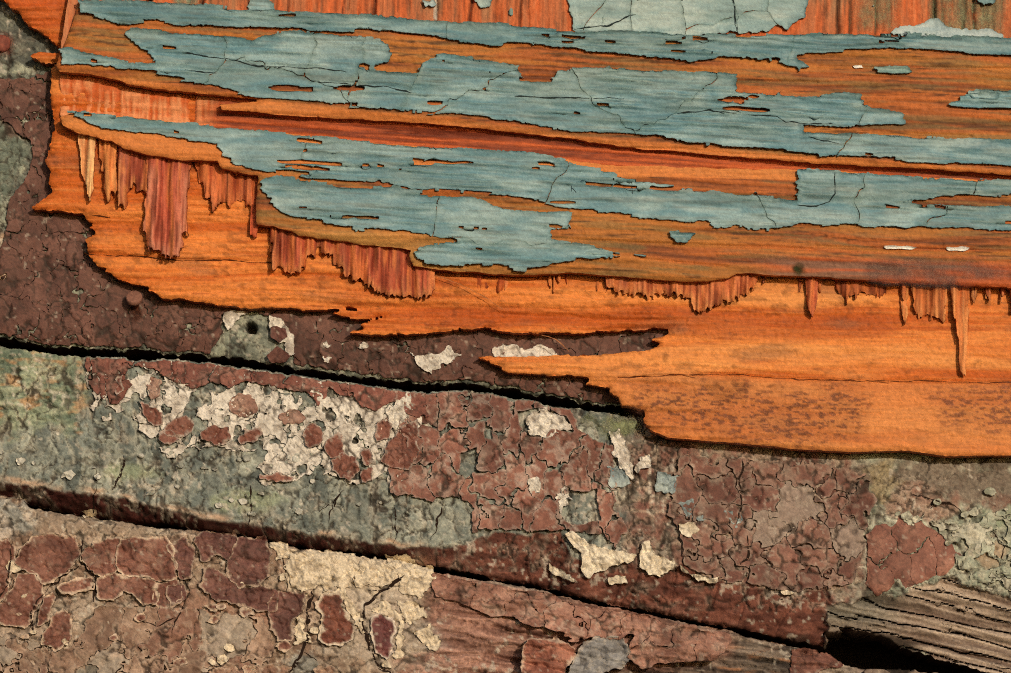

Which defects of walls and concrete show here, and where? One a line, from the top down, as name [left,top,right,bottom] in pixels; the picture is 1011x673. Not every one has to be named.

peeling [58,0,1011,272]
peeling [0,70,1011,596]
crack [93,457,125,513]
crack [320,490,344,519]
crack [736,461,755,567]
crack [913,494,962,513]
crack [0,542,13,597]
crack [30,540,97,635]
crack [140,577,190,638]
crack [283,559,316,673]
peeling [0,530,732,673]
crack [362,575,404,673]